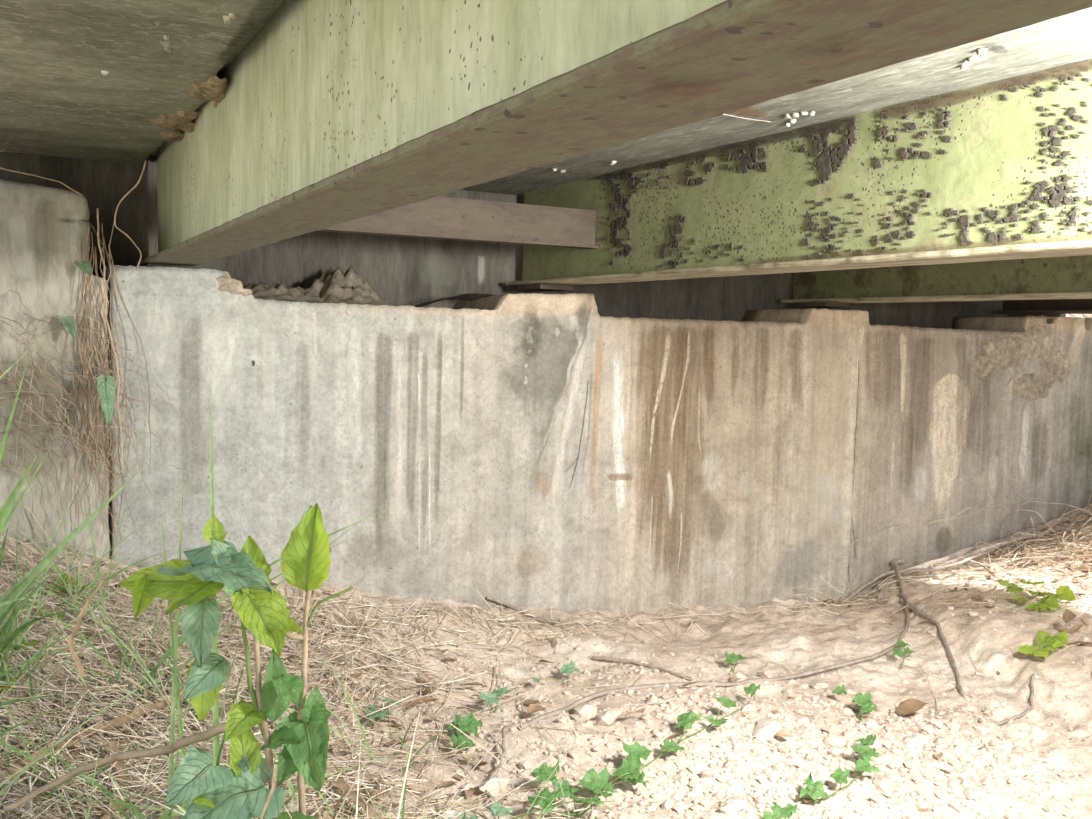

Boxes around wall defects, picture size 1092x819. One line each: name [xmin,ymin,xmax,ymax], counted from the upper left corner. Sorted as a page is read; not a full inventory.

spalling [960,48,988,70]
spalling [784,111,816,127]
peeling [801,71,1092,259]
flaking render [970,324,1073,402]
water stain [613,359,624,507]
water stain [640,331,694,559]
water stain [930,373,968,505]
water stain [1019,408,1028,473]
water stain [418,455,430,546]